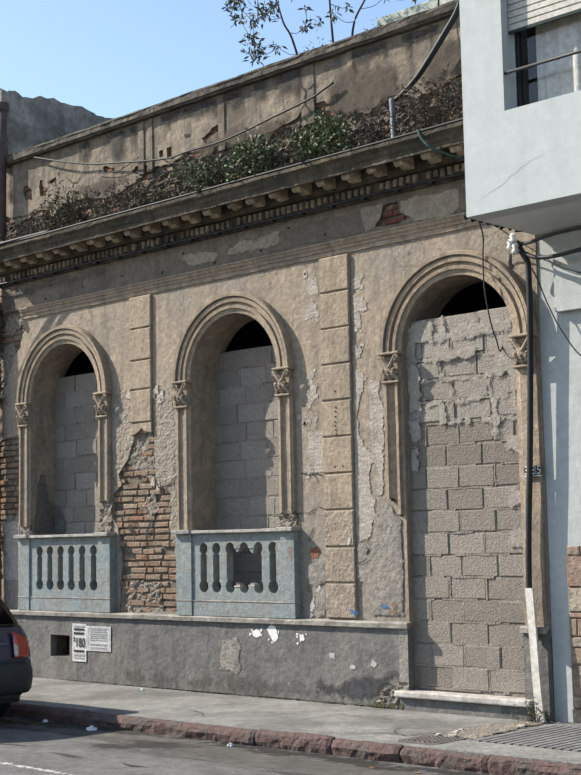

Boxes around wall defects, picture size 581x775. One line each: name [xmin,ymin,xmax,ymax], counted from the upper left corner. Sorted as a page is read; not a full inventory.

leakage [160,98,214,126]
spalling [6,76,463,245]
leakage [193,113,288,157]
peeling [351,274,367,333]
peeling [406,315,517,442]
flaking render [0,435,19,581]
flaking render [98,385,177,613]
peeling [353,370,385,542]
leakage [316,672,397,700]